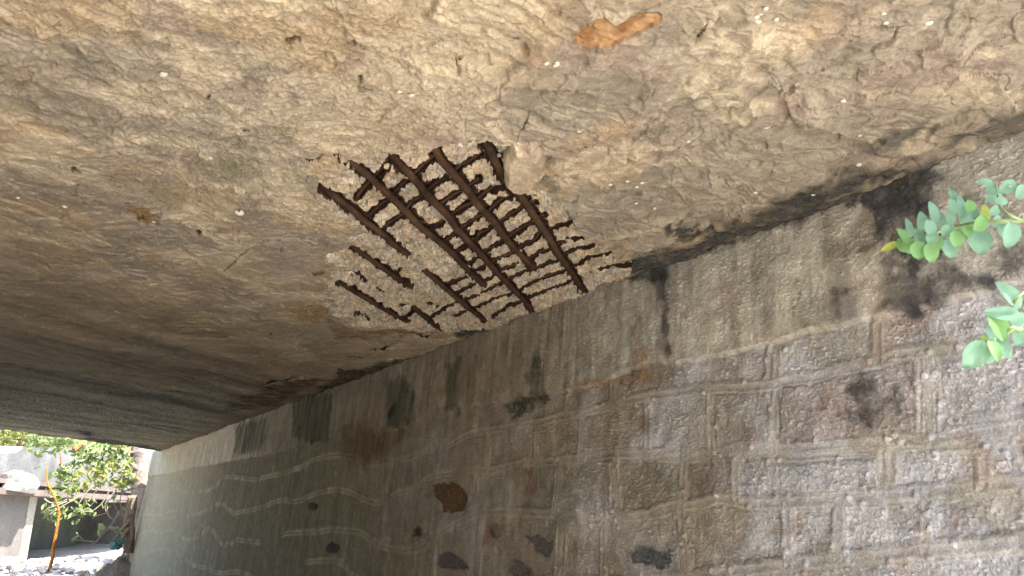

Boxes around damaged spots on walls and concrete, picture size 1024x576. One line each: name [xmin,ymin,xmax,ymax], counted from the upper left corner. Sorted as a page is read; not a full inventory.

peeling [575,12,662,49]
spalling [315,140,632,333]
leakage [628,159,997,355]
leakage [847,380,875,428]
rust [434,482,467,513]